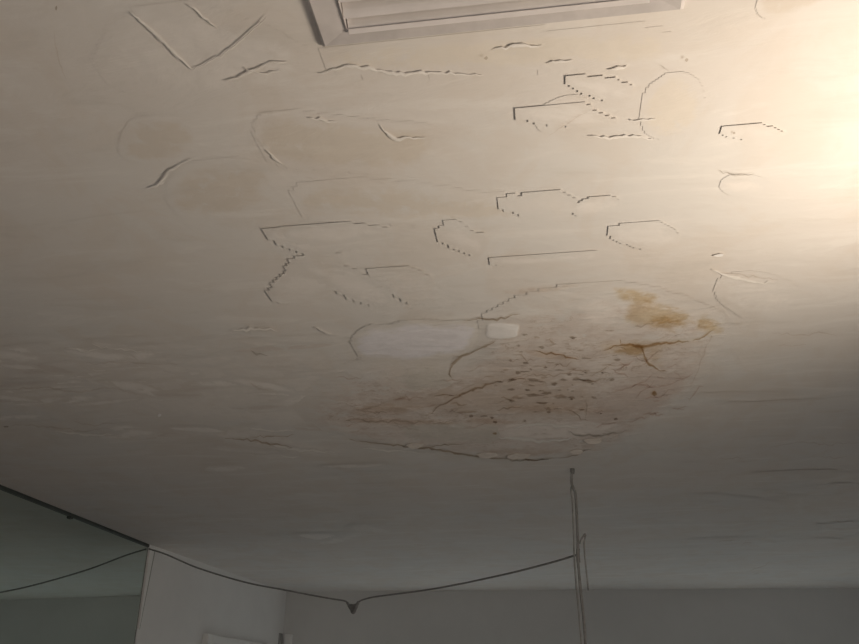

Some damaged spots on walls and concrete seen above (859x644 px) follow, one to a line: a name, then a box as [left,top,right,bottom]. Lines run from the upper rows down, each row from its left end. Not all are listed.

peeling [293,280,732,466]